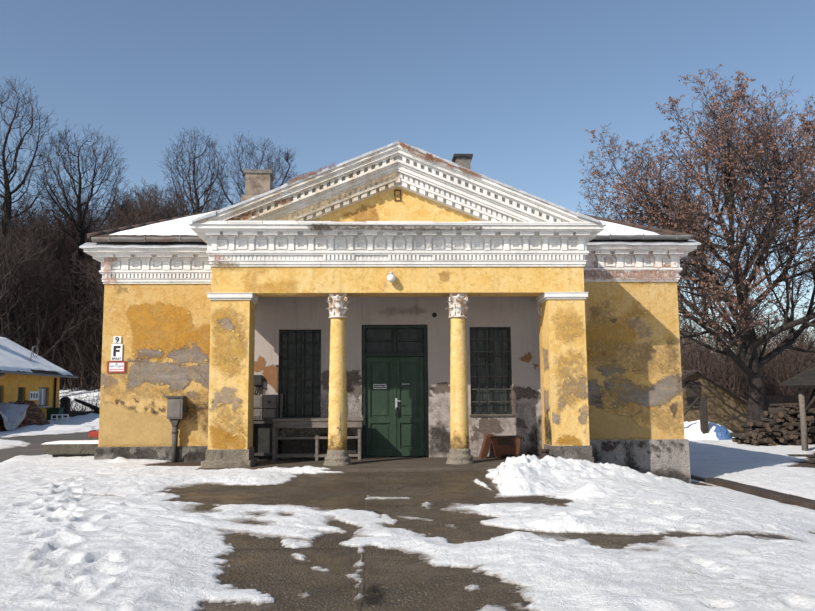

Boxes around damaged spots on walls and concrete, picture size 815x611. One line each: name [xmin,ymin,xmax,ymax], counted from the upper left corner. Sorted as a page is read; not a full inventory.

peeling [102,301,247,436]
peeling [254,355,279,395]
spalling [319,370,329,418]
spalling [346,370,363,417]
spalling [430,382,450,394]
spalling [510,302,683,430]
damp [430,426,451,454]
damp [526,409,581,456]
spalling [601,440,684,458]